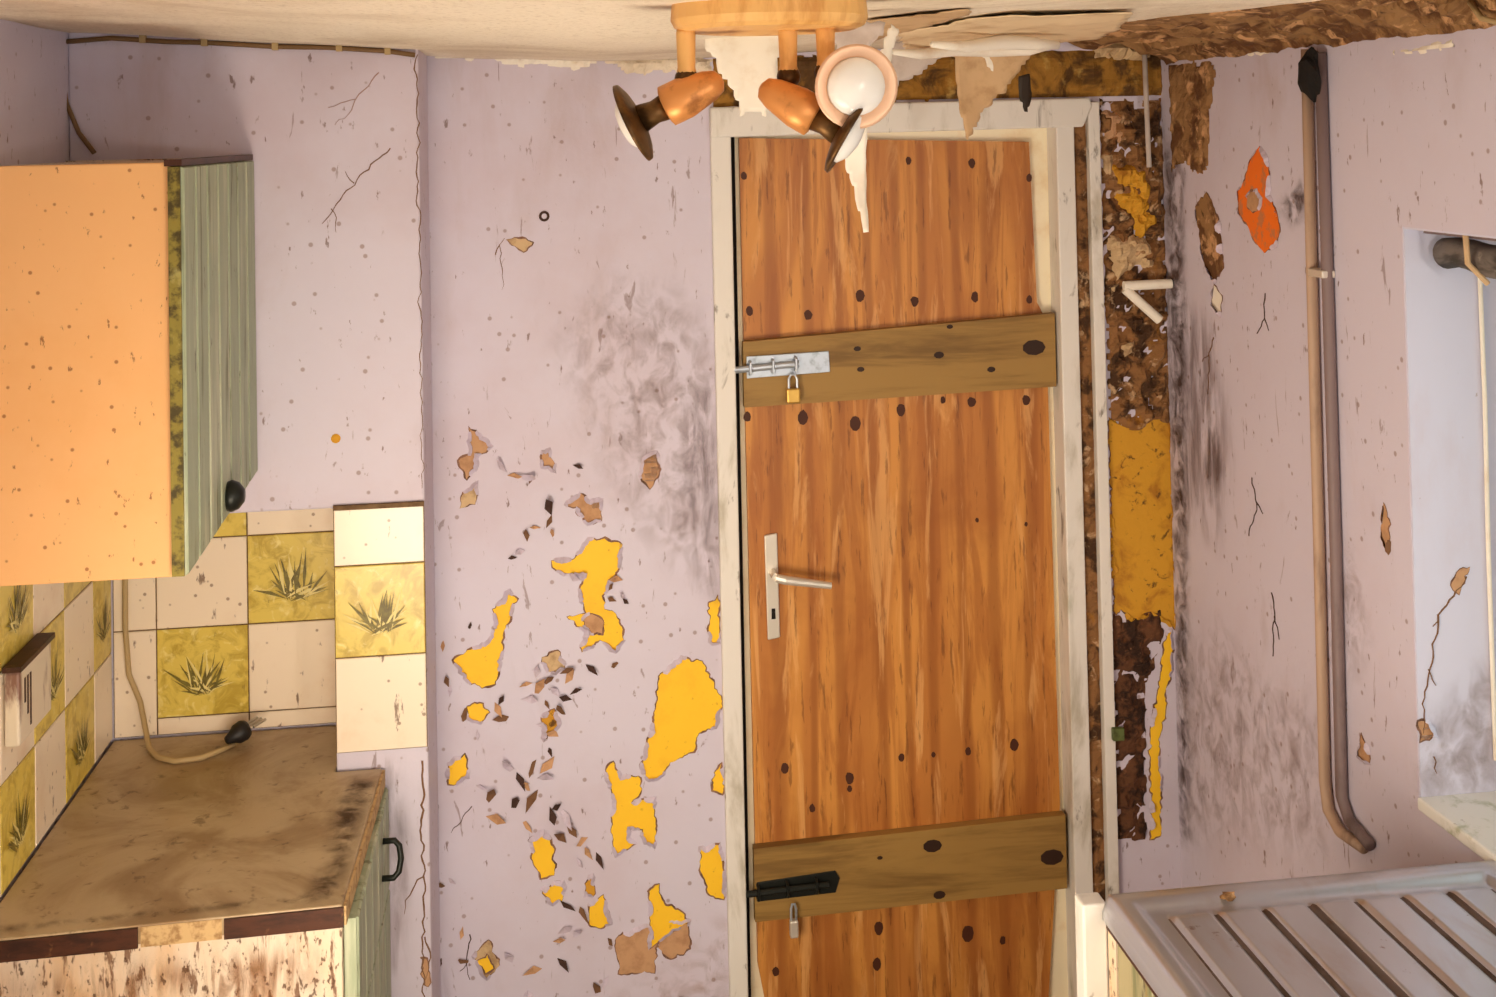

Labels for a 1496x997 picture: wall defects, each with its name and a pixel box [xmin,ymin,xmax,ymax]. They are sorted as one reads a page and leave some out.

damp [1166,157,1185,446]
peeling [457,426,583,508]
peeling [638,450,662,490]
damp [1175,466,1185,548]
spalling [1068,0,1496,841]
damp [1176,578,1186,691]
crack [1422,576,1467,774]
peeling [441,492,727,994]
peeling [420,940,542,987]